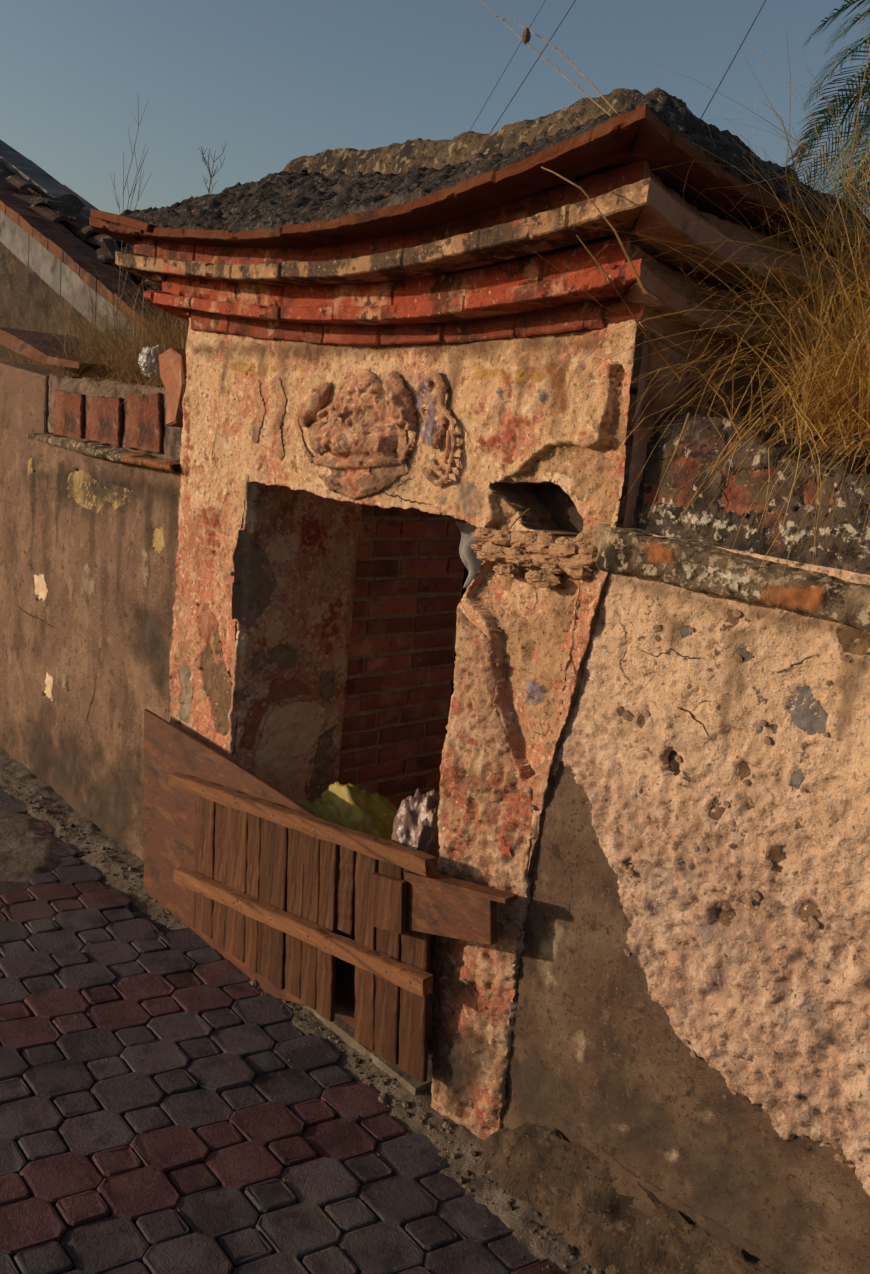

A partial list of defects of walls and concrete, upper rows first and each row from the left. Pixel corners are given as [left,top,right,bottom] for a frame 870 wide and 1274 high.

flaking render [508,367,626,543]
damp [32,464,175,555]
flaking render [492,495,541,535]
flaking render [177,530,337,750]
crack [614,610,707,688]
flaking render [308,726,339,802]
peeling [473,561,870,1274]